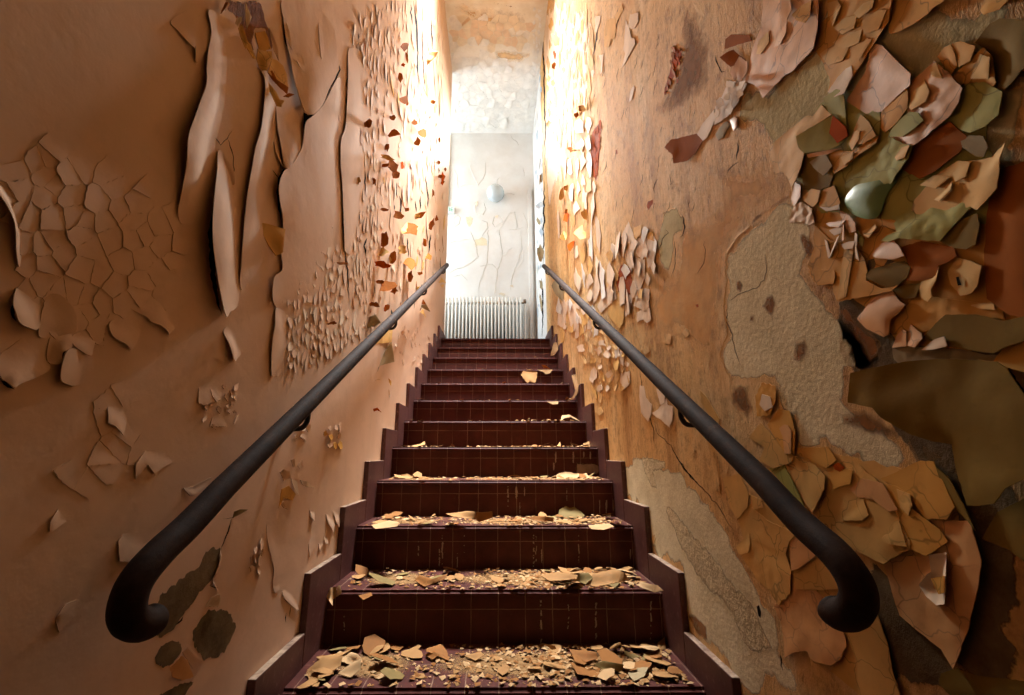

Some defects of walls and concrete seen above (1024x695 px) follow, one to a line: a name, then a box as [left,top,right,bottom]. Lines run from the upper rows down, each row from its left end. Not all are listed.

peeling [0,288,94,389]
crack [0,133,195,356]
peeling [170,0,446,397]
flaking render [509,0,1024,695]
peeling [183,477,212,497]
flaking render [155,509,247,695]